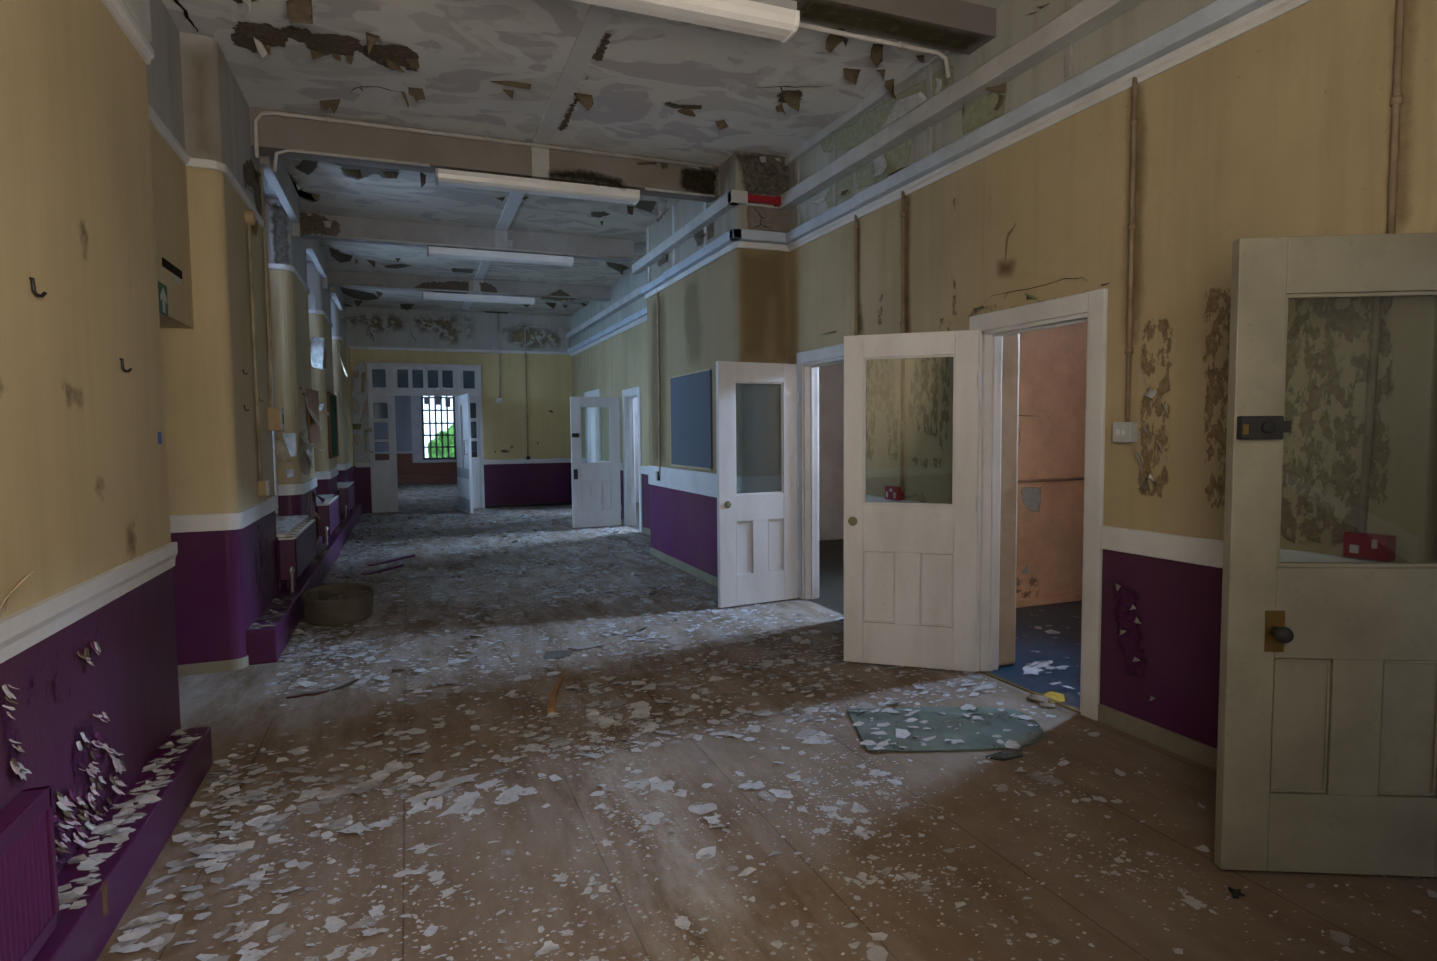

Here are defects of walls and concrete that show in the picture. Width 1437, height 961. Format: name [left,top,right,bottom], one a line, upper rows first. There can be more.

crack [174,0,198,32]
peeling [231,0,426,107]
peeling [558,33,612,131]
peeling [662,102,702,117]
peeling [825,28,848,53]
peeling [243,160,410,269]
peeling [590,198,667,225]
peeling [400,268,498,311]
peeling [72,631,101,670]
peeling [108,287,1255,961]
peeling [0,668,70,782]
peeling [52,710,202,911]